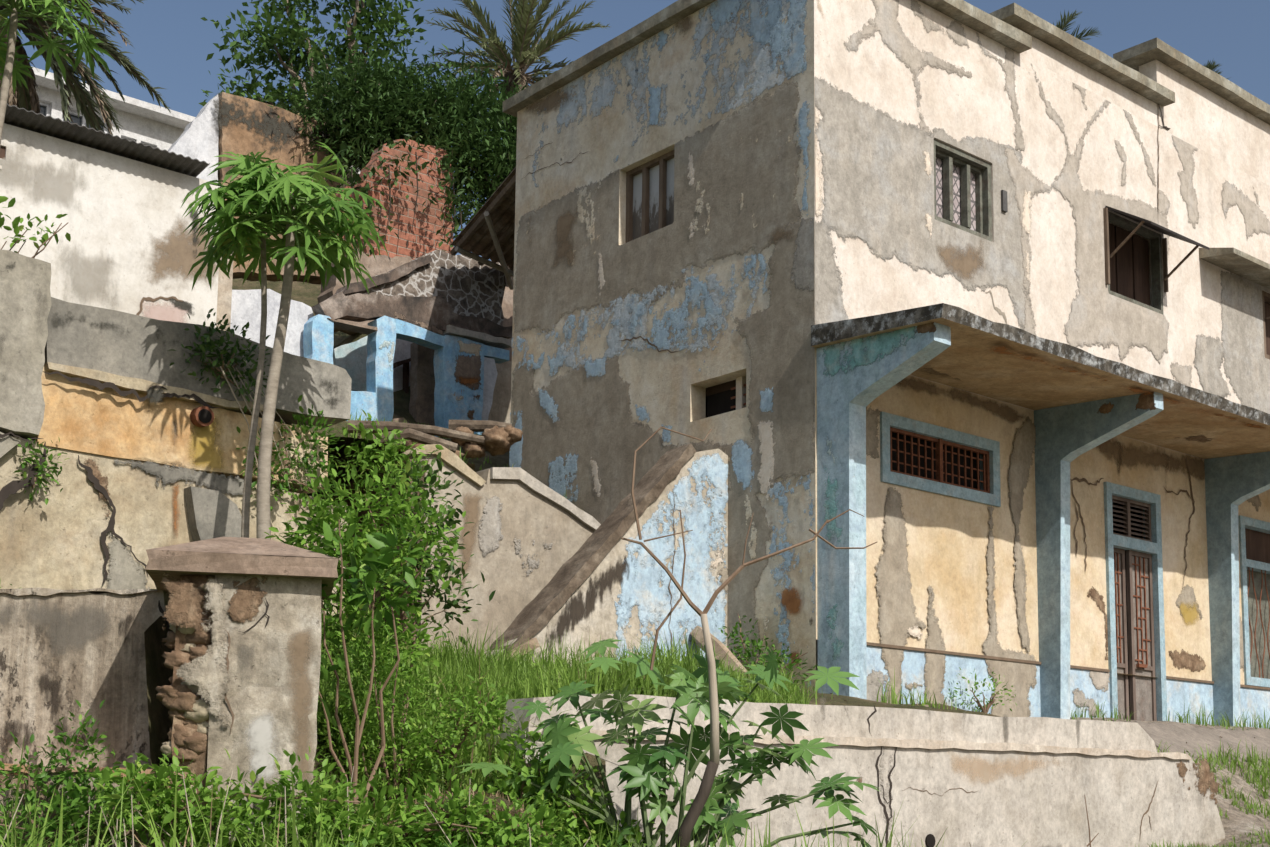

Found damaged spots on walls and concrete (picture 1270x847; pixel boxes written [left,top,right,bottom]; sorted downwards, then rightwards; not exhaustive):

leakage [213,93,331,153]
peeling [512,0,1270,672]
crack [0,432,46,510]
crack [78,455,169,631]
spalling [161,572,208,633]
spalling [227,576,267,623]
peeling [867,487,949,706]
peeling [982,416,1038,717]
peeling [1073,586,1110,716]
crack [867,706,977,846]